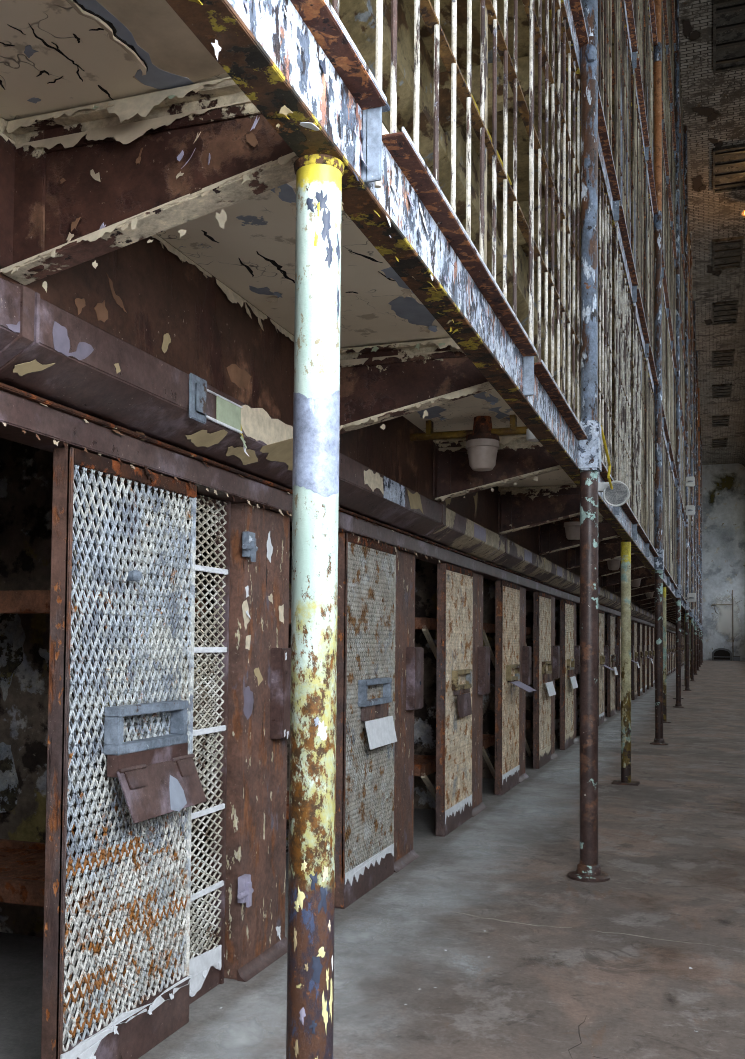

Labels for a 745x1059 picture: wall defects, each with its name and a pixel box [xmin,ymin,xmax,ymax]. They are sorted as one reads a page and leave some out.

crack [0,23,113,100]
peeling [0,0,251,165]
peeling [0,152,296,275]
crack [239,251,295,283]
peeling [271,183,344,323]
crack [348,250,395,281]
peeling [186,405,293,471]
corrosion [66,837,144,879]
corrosion [109,895,187,945]
corrosion [63,961,117,1009]
corrosion [69,999,113,1038]
peeling [60,945,225,1059]